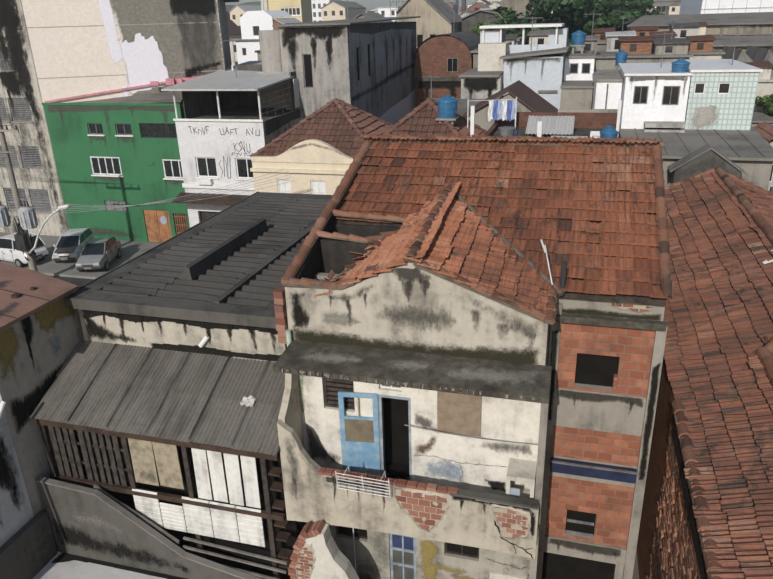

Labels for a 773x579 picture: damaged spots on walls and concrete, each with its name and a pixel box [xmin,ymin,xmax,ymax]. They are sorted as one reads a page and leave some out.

peeling [110,0,194,95]
peeling [213,1,225,70]
damp [282,27,344,70]
damp [0,0,175,202]
damp [394,268,430,299]
damp [82,310,278,350]
damp [292,294,309,328]
damp [11,365,63,431]
flaking render [296,544,316,579]
flaking render [393,487,450,532]
crack [486,520,533,570]
flaking render [491,504,531,541]